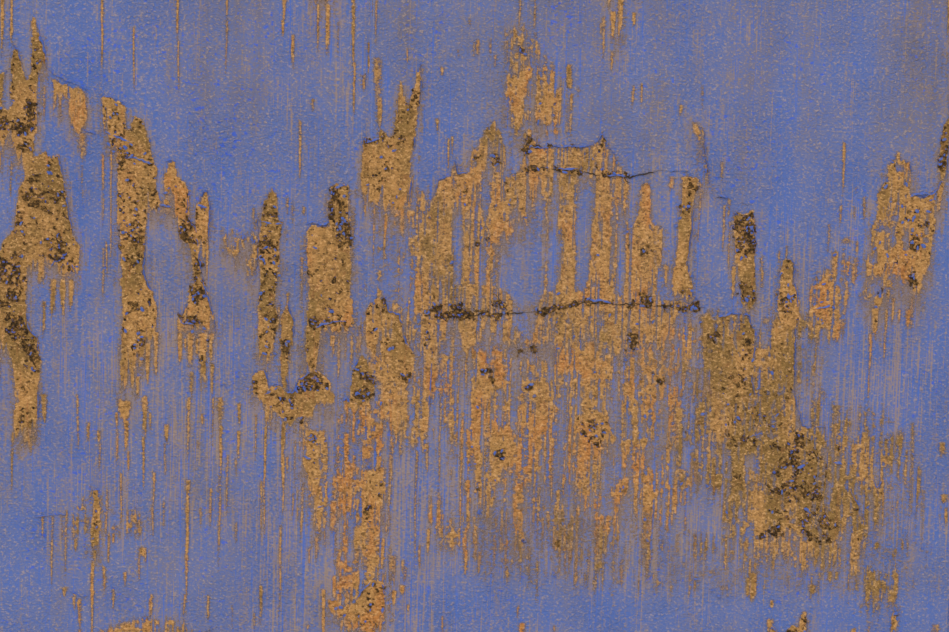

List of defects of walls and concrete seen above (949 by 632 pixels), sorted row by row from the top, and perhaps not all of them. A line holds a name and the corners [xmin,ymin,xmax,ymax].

crack [506,167,680,183]
peeling [805,142,866,344]
crack [457,295,555,316]
crack [580,299,674,307]